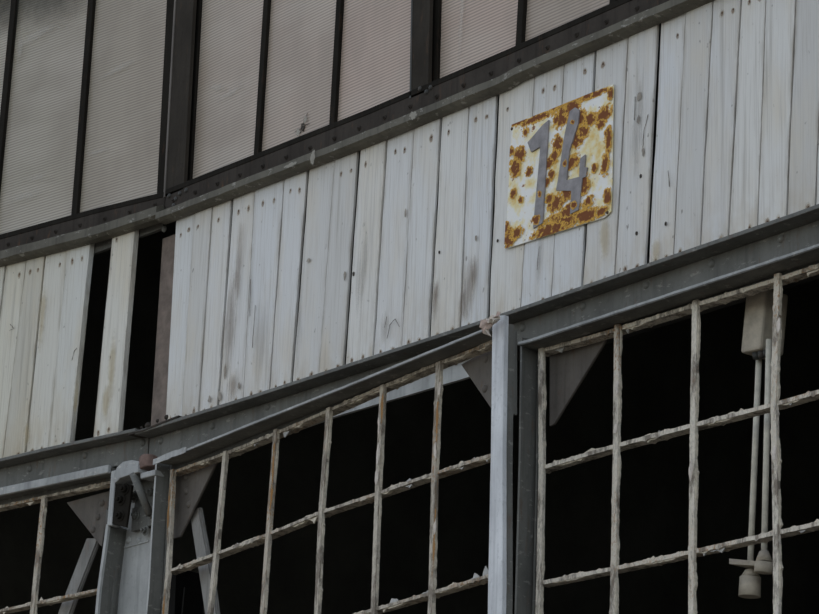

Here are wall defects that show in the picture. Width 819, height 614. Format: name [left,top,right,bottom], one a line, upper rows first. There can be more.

rust [504,87,613,248]